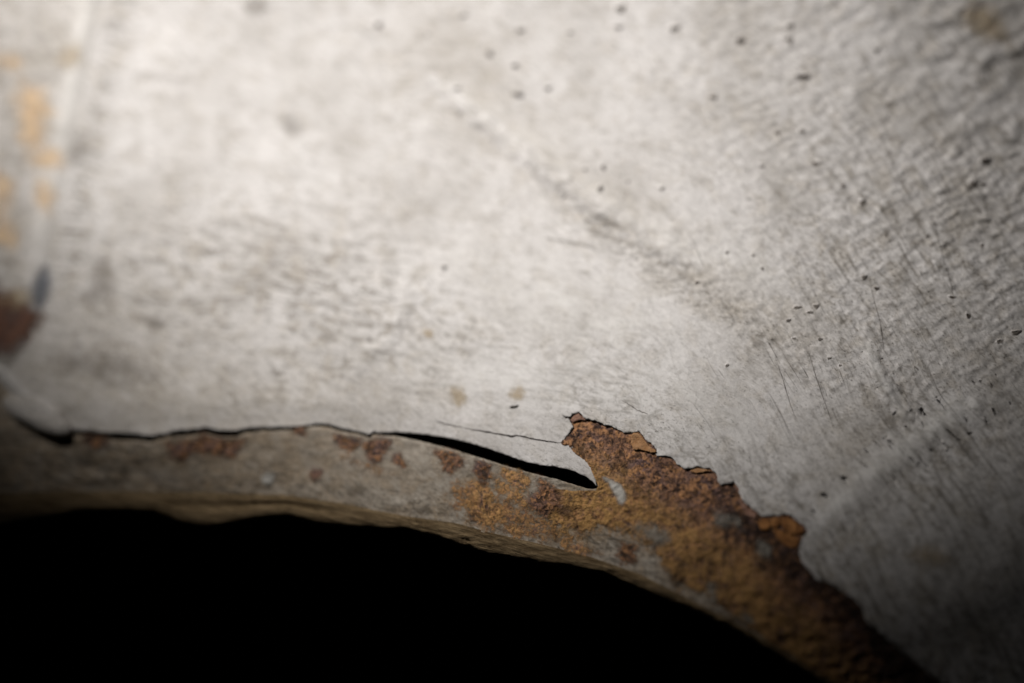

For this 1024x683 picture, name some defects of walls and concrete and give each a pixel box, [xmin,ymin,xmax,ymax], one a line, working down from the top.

crack [71,421,596,489]
corrosion [333,433,406,474]
corrosion [434,450,592,556]
peeling [544,412,939,683]